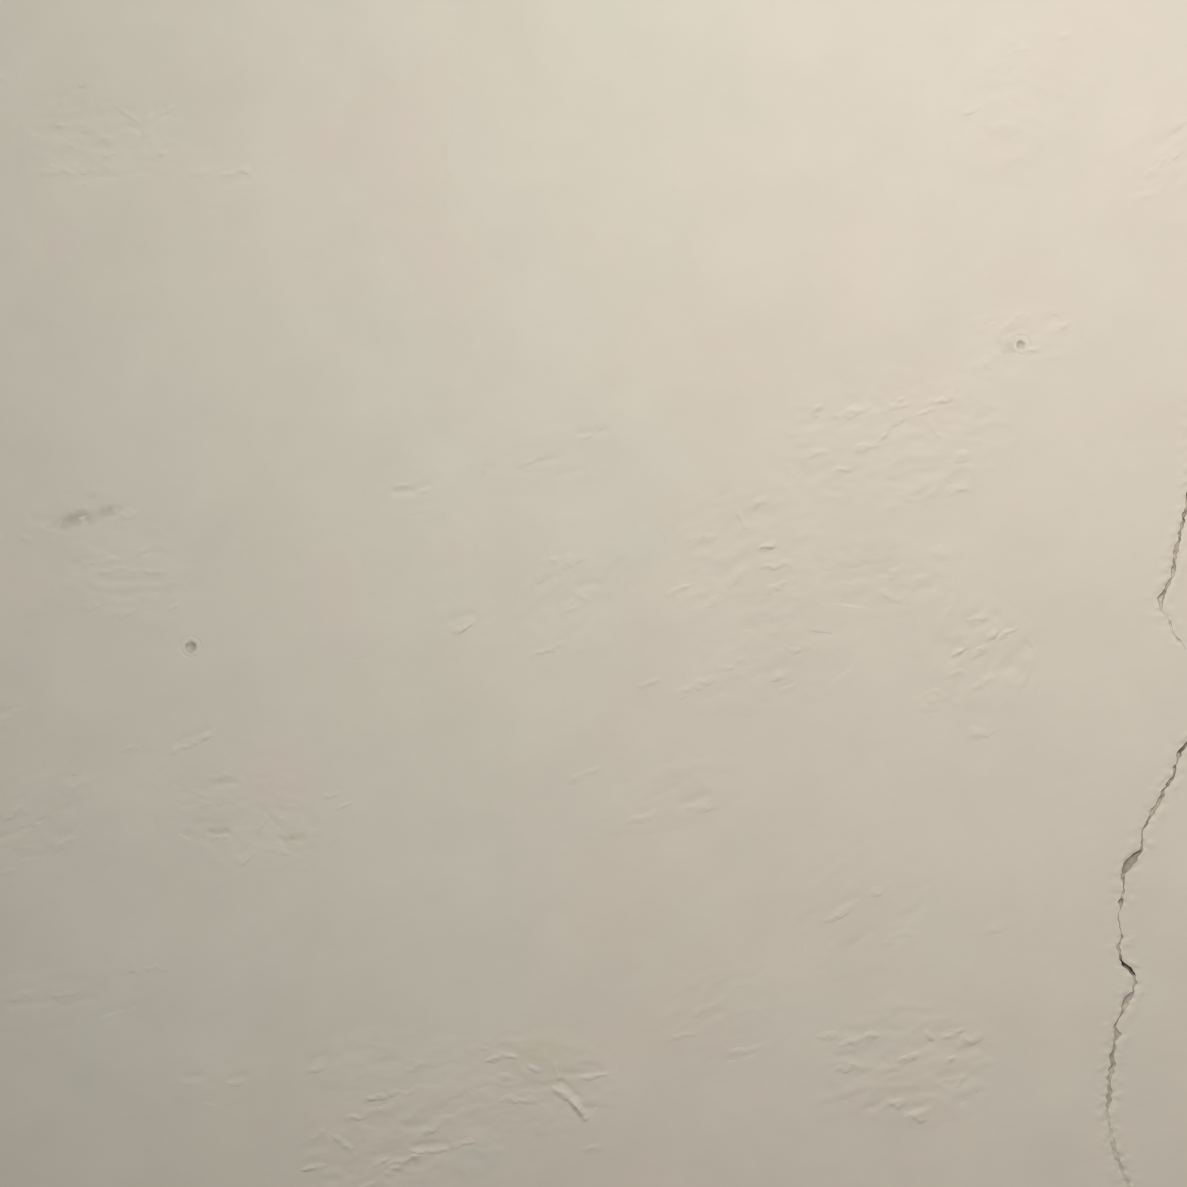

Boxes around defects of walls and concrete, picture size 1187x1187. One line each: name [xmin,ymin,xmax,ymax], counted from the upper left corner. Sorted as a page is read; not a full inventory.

crack [1157,492,1187,647]
crack [1105,742,1187,1187]